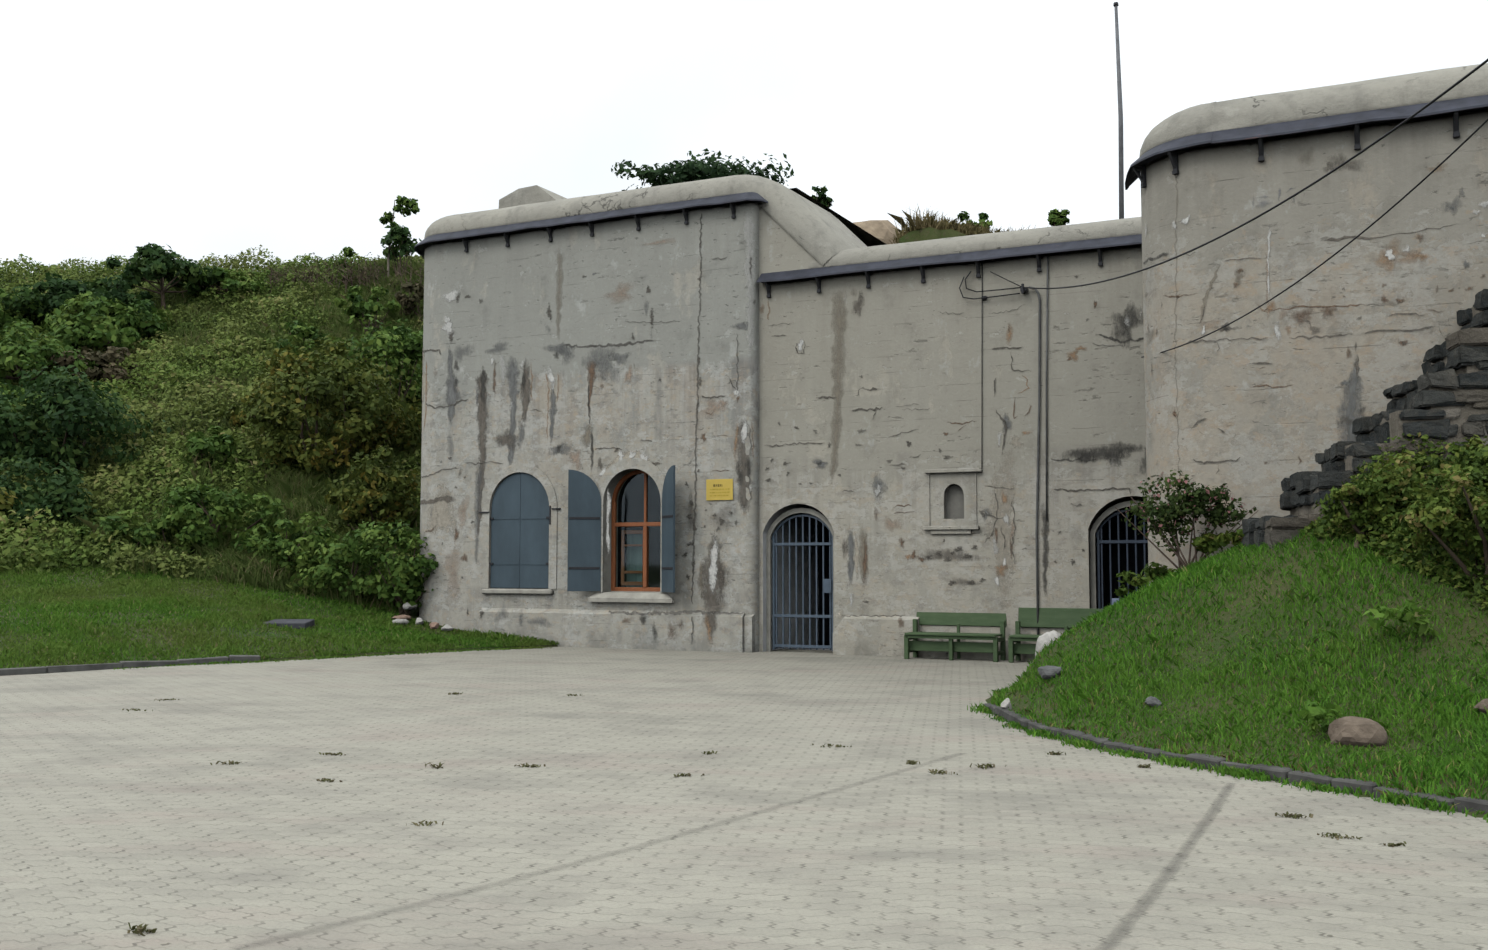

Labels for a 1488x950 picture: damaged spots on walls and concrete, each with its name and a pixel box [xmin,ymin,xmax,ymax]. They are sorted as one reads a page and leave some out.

leakage [446,344,524,554]
leakage [546,345,569,454]
corrosion [572,362,602,465]
leakage [816,295,863,474]
leakage [1053,442,1146,467]
leakage [609,539,744,640]
leakage [843,533,854,605]